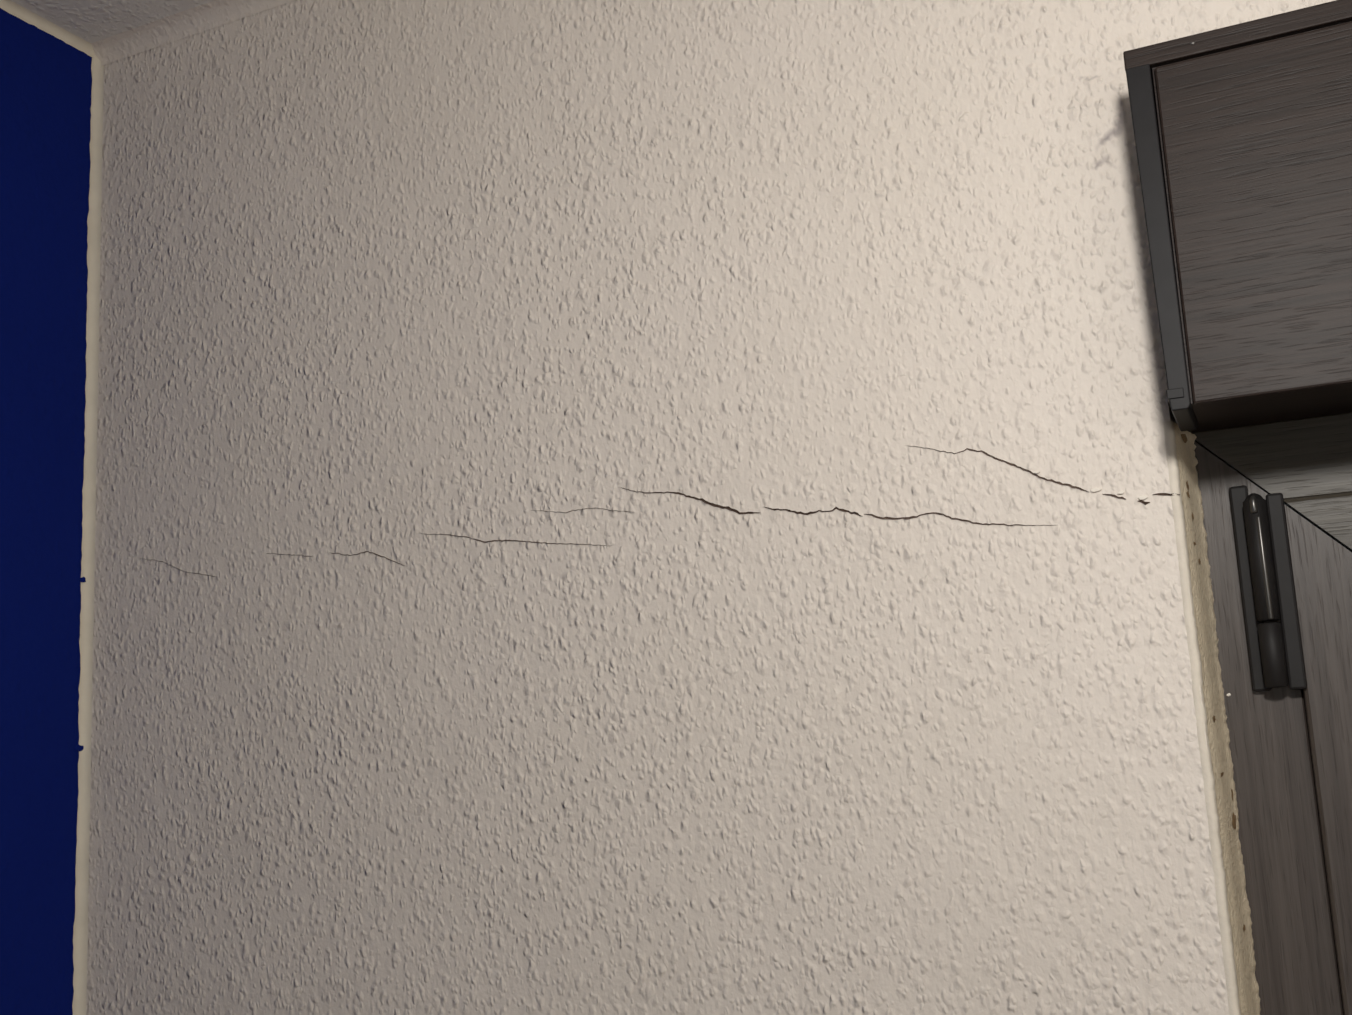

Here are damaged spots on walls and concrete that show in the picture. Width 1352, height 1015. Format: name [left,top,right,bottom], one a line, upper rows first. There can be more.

crack [915,446,1180,505]
crack [428,487,1052,546]
crack [268,551,405,566]